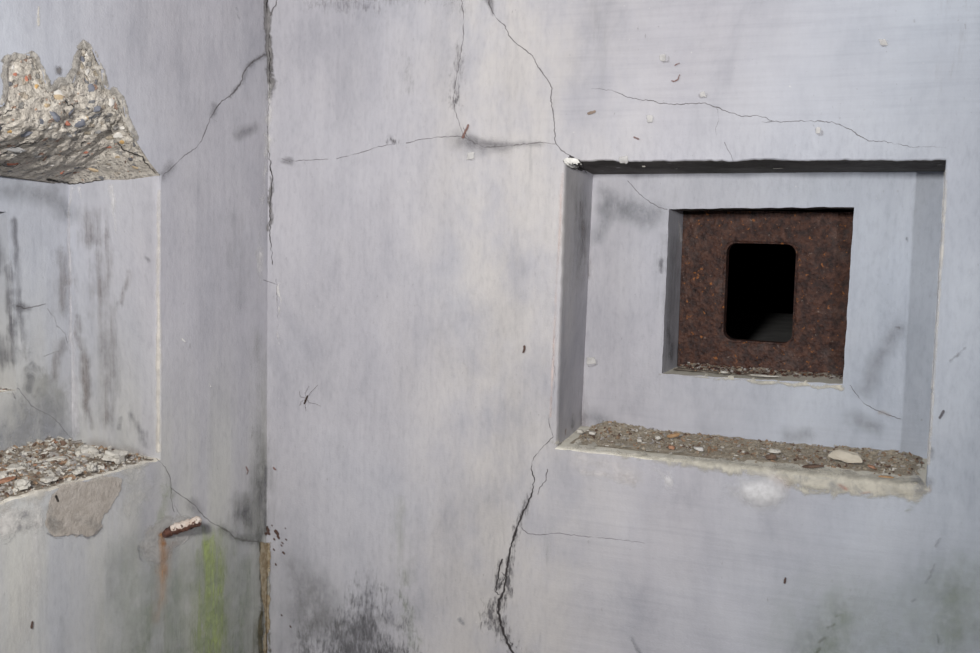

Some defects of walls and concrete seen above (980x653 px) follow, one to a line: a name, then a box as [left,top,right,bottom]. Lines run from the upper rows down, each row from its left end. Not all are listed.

spalling [0,40,160,185]
crack [162,0,278,301]
crack [298,0,582,167]
crack [593,88,914,160]
peeling [0,476,122,538]
crack [156,458,259,542]
crack [484,338,645,653]
water stain [311,599,408,653]